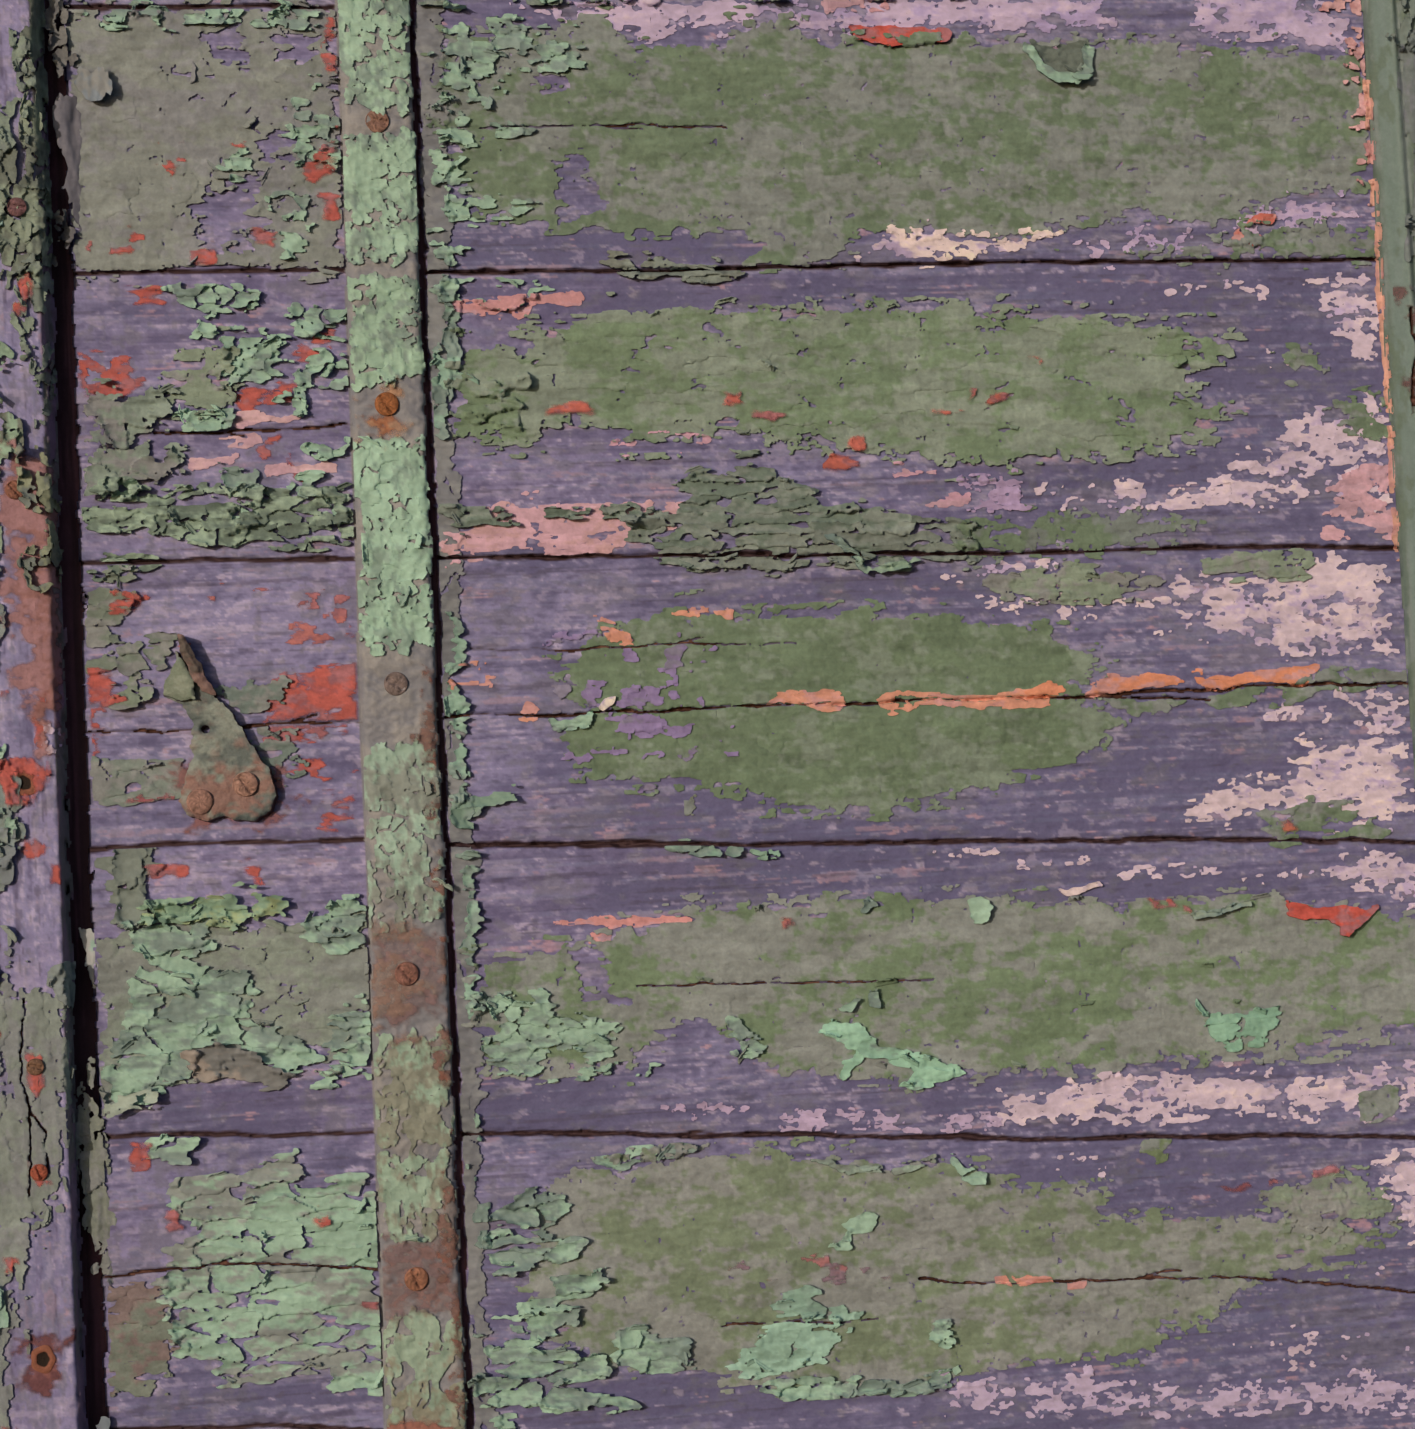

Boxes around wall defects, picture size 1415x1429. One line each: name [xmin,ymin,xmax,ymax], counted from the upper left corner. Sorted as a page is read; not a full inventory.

peeling [0,0,419,416]
peeling [81,271,435,656]
rust [0,439,63,759]
rust [257,765,286,832]
rust [410,706,438,766]
crack [508,704,806,719]
peeling [542,554,1201,822]
crack [1023,681,1408,701]
crack [19,1000,49,1196]
rust [15,1329,76,1397]
peeling [107,1024,467,1429]
crack [1052,1269,1415,1293]